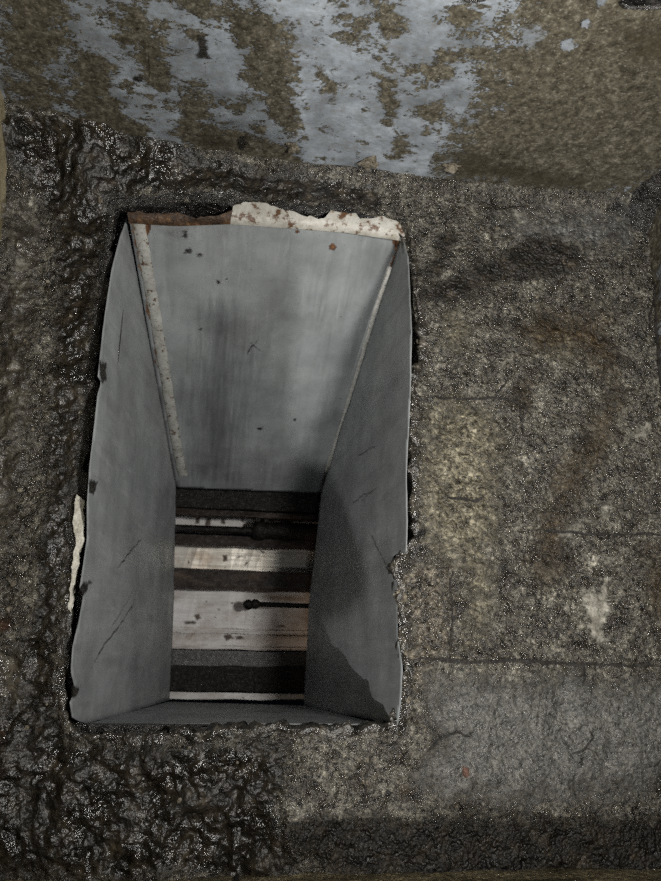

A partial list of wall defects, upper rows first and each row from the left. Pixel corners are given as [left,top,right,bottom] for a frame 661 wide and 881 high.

peeling [0,0,348,163]
peeling [317,0,661,192]
water stain [420,223,592,300]
water stain [0,104,380,881]
water stain [424,405,493,621]
water stain [292,815,661,875]